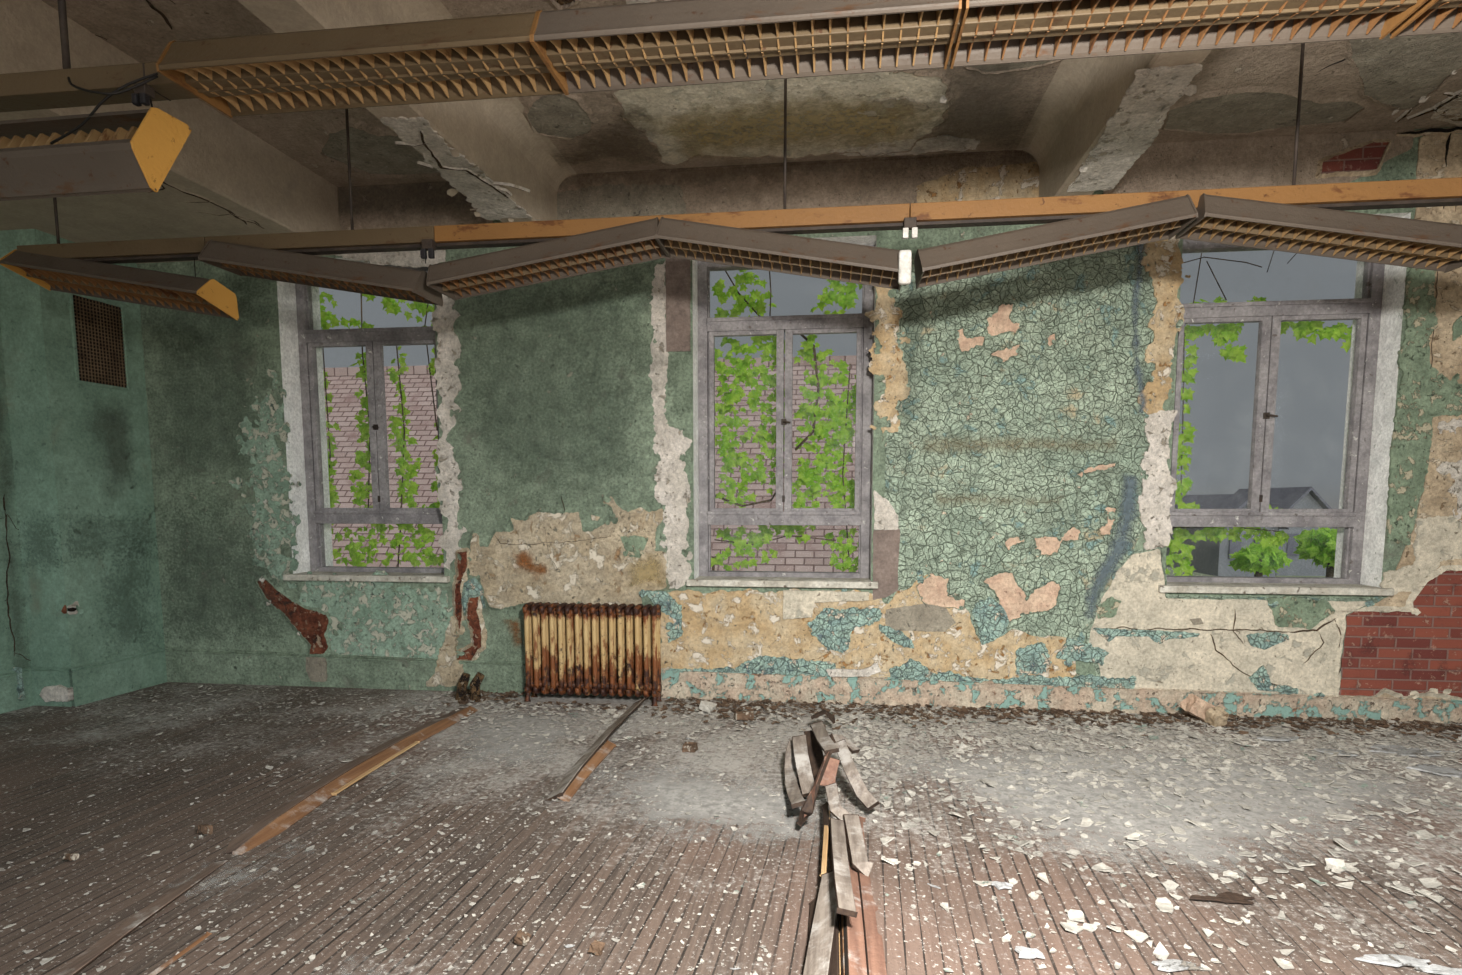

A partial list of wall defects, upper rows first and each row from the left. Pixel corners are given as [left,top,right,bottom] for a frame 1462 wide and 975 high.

crack [145,0,177,30]
damp [674,103,914,154]
peeling [1414,206,1462,225]
peeling [228,235,1462,700]
crack [884,245,1342,686]
crack [0,494,31,662]